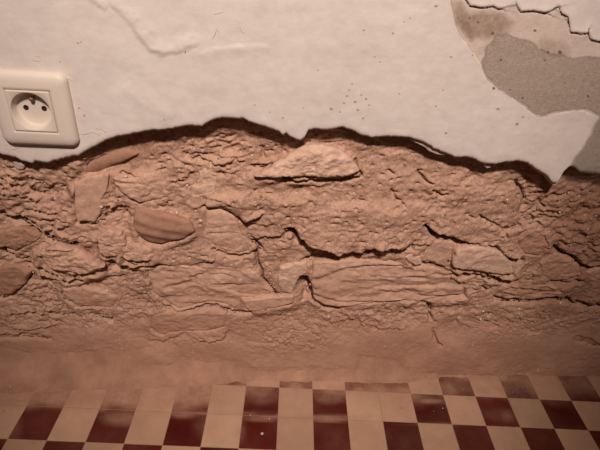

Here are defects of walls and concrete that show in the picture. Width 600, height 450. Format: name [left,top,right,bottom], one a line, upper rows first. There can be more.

peeling [451,0,600,116]
crack [467,1,600,42]
flaking render [0,118,600,376]